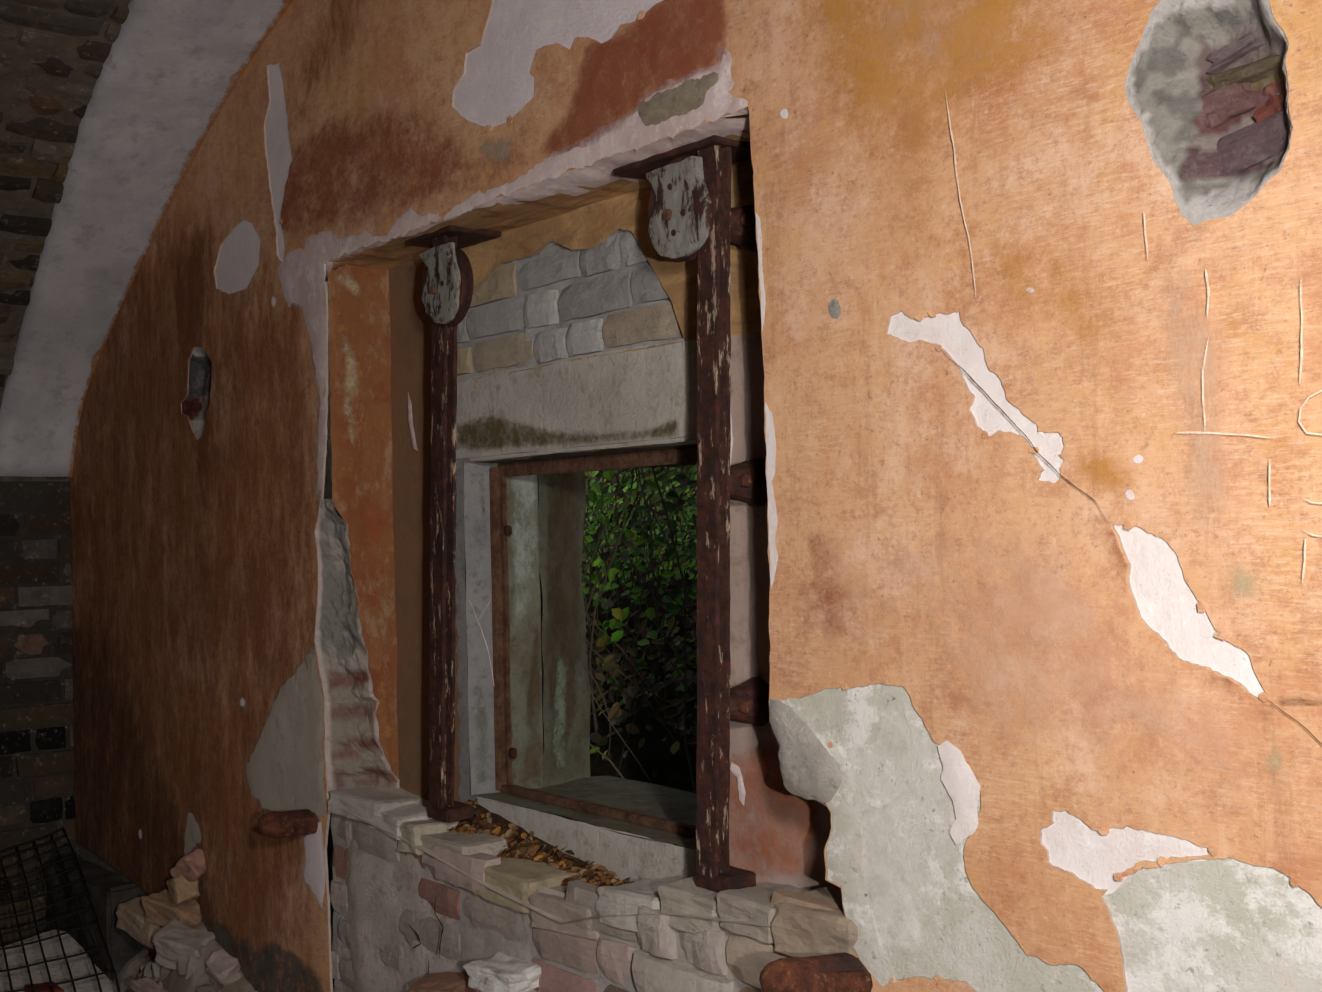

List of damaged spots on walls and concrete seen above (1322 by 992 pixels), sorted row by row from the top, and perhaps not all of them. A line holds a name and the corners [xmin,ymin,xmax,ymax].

flaking render [454,0,663,132]
flaking render [1125,0,1293,226]
flaking render [213,220,261,294]
flaking render [182,347,212,440]
flaking render [245,47,1104,992]
crack [943,352,1107,521]
flaking render [1114,520,1269,702]
crack [1266,698,1322,744]
flaking render [1041,810,1322,992]